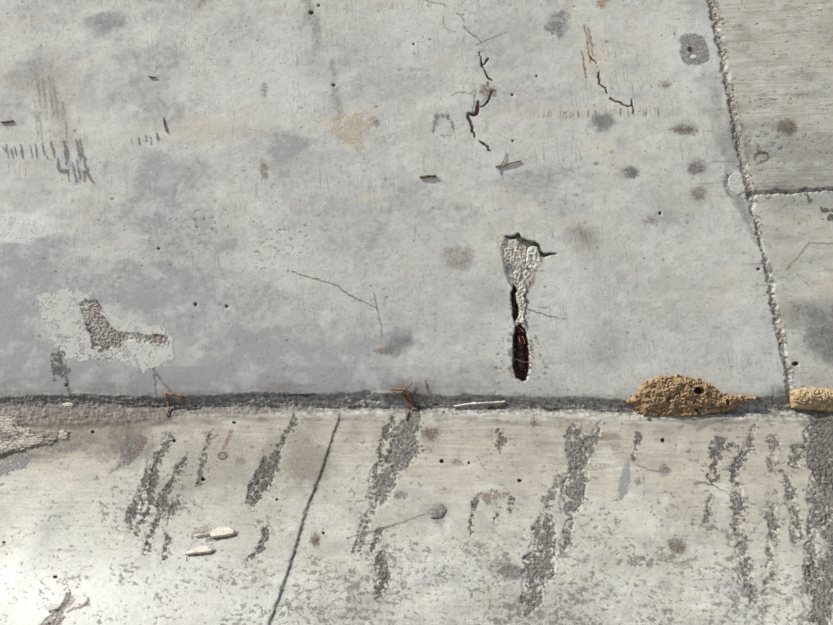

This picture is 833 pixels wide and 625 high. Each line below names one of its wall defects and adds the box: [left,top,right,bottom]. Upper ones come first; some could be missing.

crack [460,15,501,151]
crack [591,57,634,114]
peeling [36,287,174,381]
crack [287,269,382,333]
spalling [503,233,557,381]
peeling [0,410,71,458]